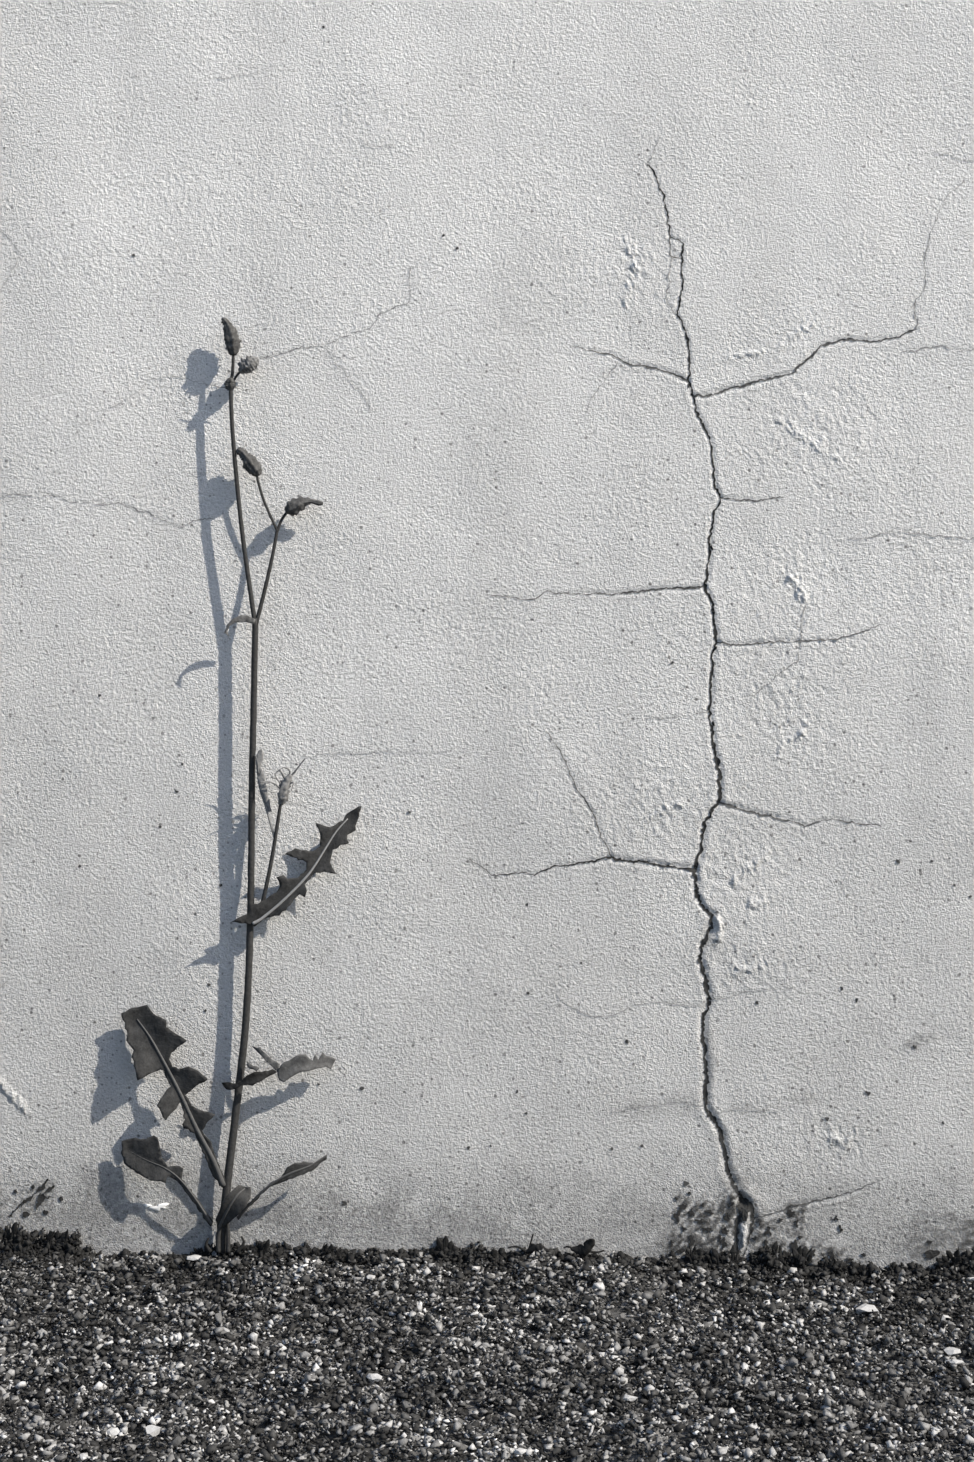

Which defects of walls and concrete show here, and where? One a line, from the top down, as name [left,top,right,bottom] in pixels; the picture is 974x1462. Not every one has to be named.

crack [469,137,974,1256]